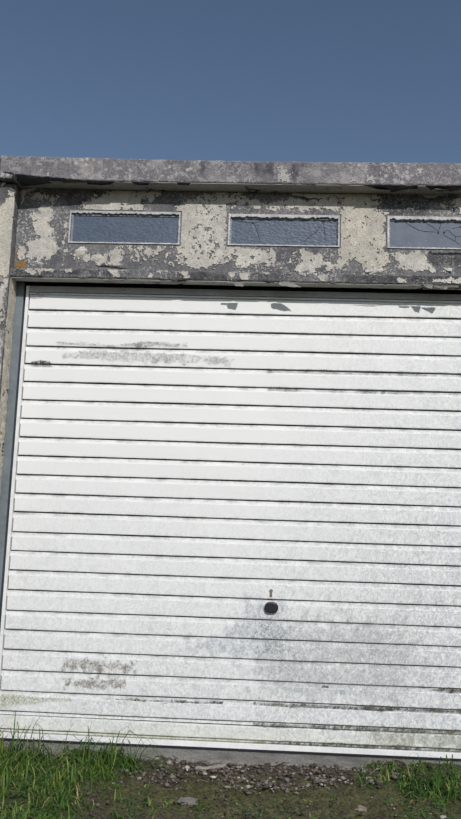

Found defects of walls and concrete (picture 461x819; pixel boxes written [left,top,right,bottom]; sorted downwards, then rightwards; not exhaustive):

peeling [0,159,461,492]